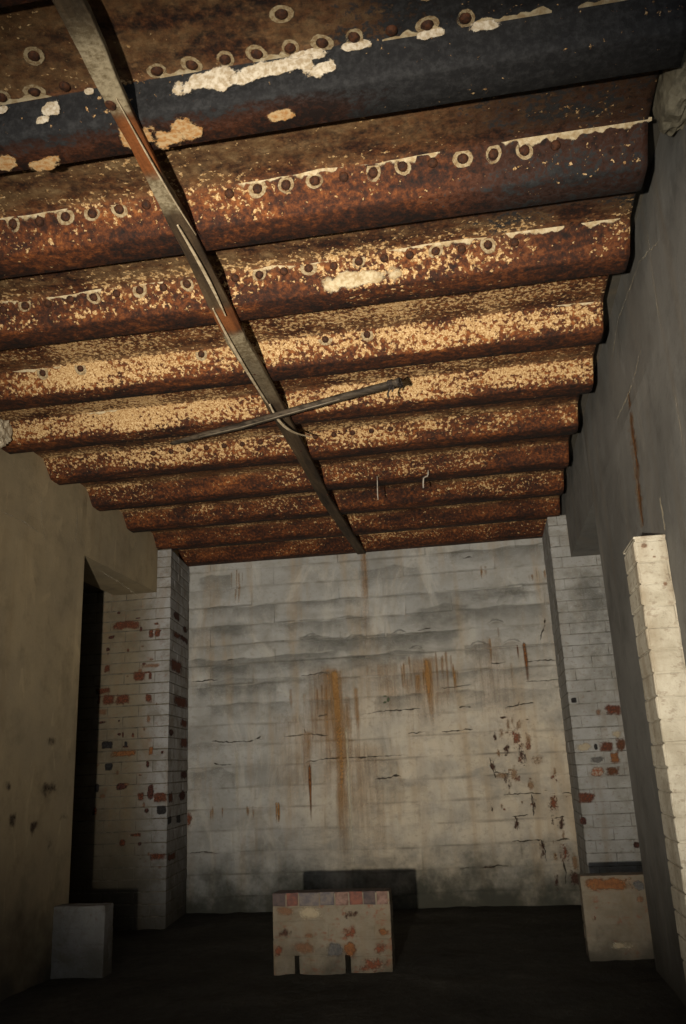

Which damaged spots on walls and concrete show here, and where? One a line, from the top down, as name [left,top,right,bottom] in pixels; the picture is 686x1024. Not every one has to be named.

peeling [341,39,372,52]
peeling [417,27,444,40]
peeling [470,19,499,32]
peeling [172,48,336,96]
peeling [36,101,60,124]
peeling [267,109,296,122]
peeling [143,117,203,149]
peeling [0,155,60,171]
peeling [322,266,401,293]
crack [506,620,558,708]
crack [214,714,399,779]
corrosion [317,671,345,812]